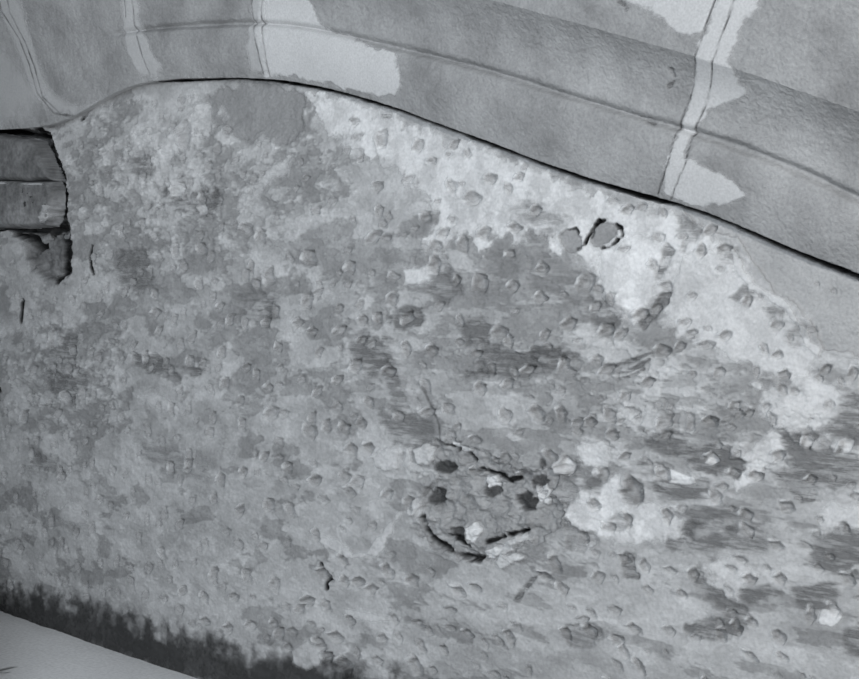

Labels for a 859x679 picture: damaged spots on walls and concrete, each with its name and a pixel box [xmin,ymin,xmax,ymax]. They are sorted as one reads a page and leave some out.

spalling [0,127,73,284]
flaking render [560,219,624,252]
flaking render [390,306,423,330]
spalling [642,292,672,327]
flaking render [462,321,574,387]
spalling [617,346,657,380]
flaking render [775,395,859,485]
flaking render [401,435,575,569]
flaking render [641,420,773,550]
flaking render [811,522,859,578]
flaking render [684,568,776,638]
flaking render [793,583,838,610]